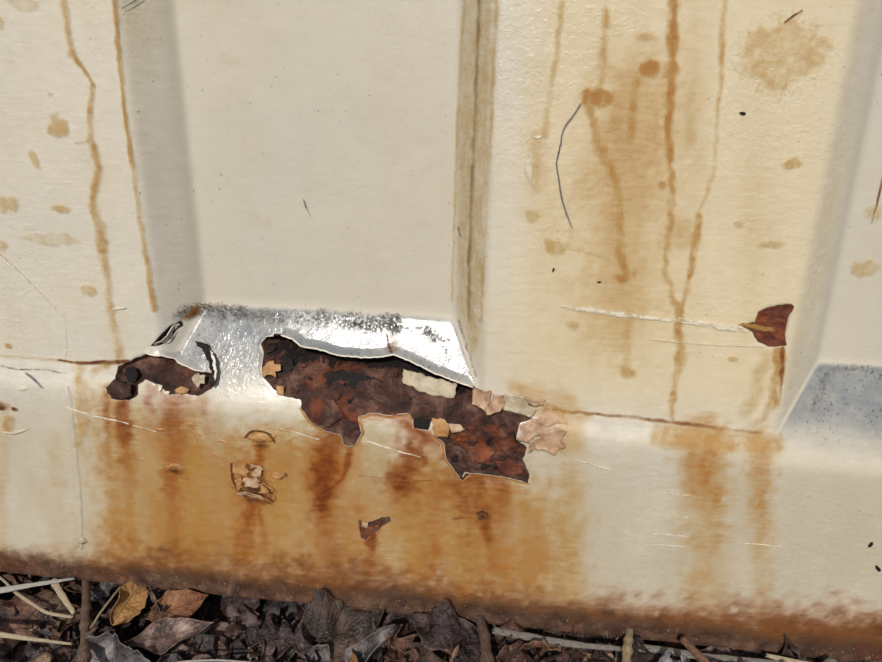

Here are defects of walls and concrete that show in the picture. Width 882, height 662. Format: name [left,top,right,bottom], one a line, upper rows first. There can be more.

corrosion [62,5,94,118]
corrosion [89,136,109,276]
corrosion [112,0,134,168]
corrosion [582,88,640,232]
corrosion [635,0,679,193]
corrosion [143,244,157,311]
peeling [106,321,217,400]
peeling [257,327,569,485]
peeling [739,304,796,347]
corrosion [768,347,786,406]
peeling [358,517,391,540]
corrosion [0,391,882,662]